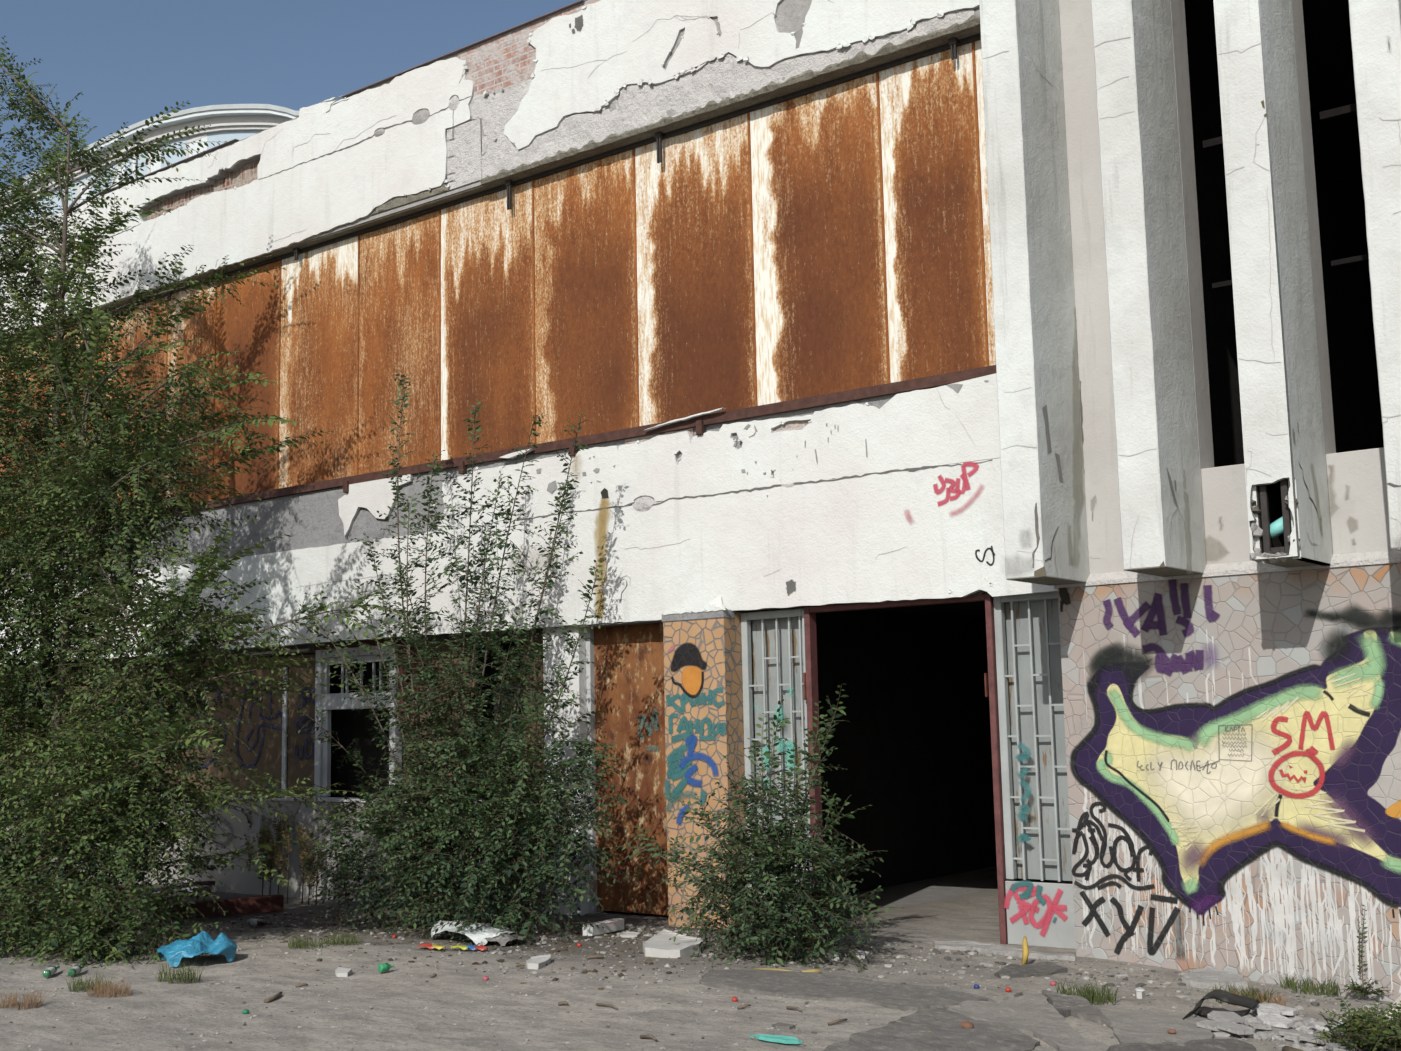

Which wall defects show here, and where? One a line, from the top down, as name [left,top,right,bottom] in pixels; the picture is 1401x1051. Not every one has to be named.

crack [258,58,471,180]
spalling [457,0,981,188]
rust [0,40,996,533]
flaking render [102,449,569,572]
rust [596,500,609,617]
crack [516,392,1037,521]
spalling [1250,477,1301,564]